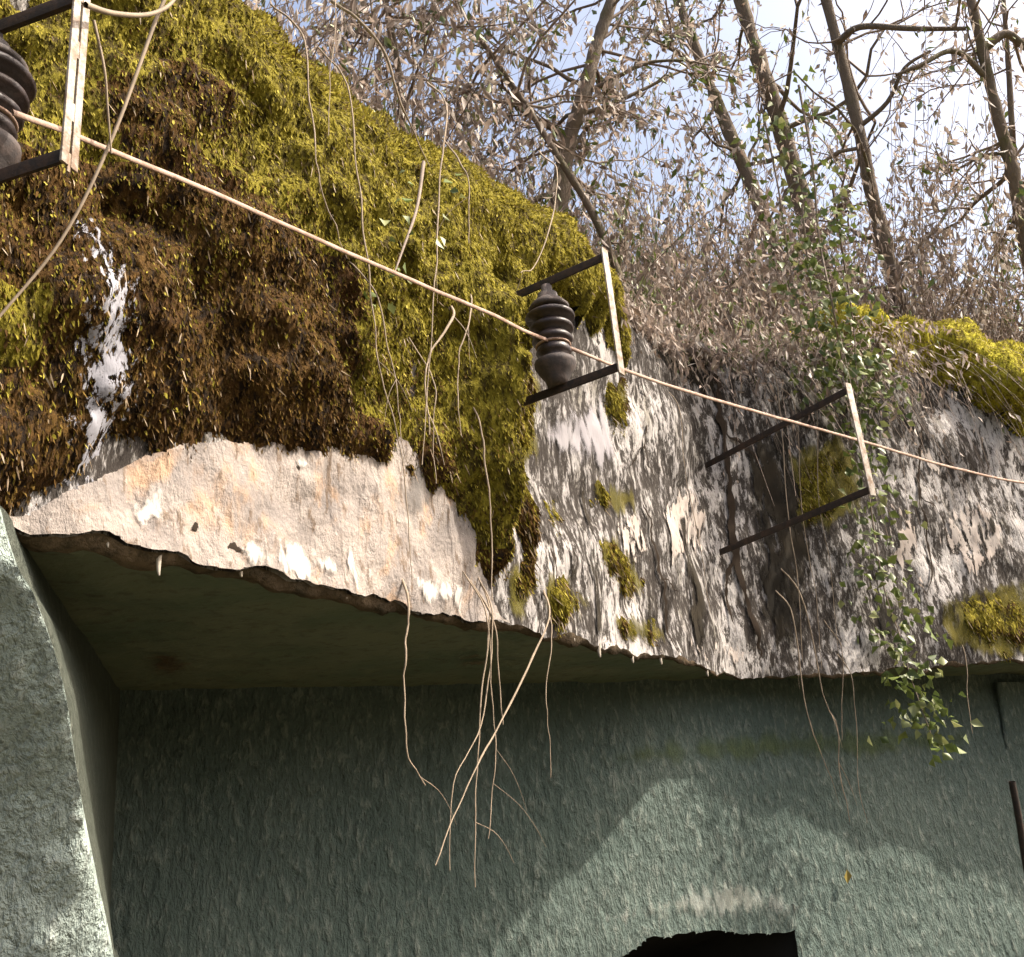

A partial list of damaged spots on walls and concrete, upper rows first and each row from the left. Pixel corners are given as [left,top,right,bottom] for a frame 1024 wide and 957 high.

water stain [62,218,141,489]
spalling [10,437,512,624]
peeling [618,514,646,562]
peeling [664,489,706,566]
peeling [890,497,919,569]
peeling [939,502,1012,575]
peeling [691,639,744,663]